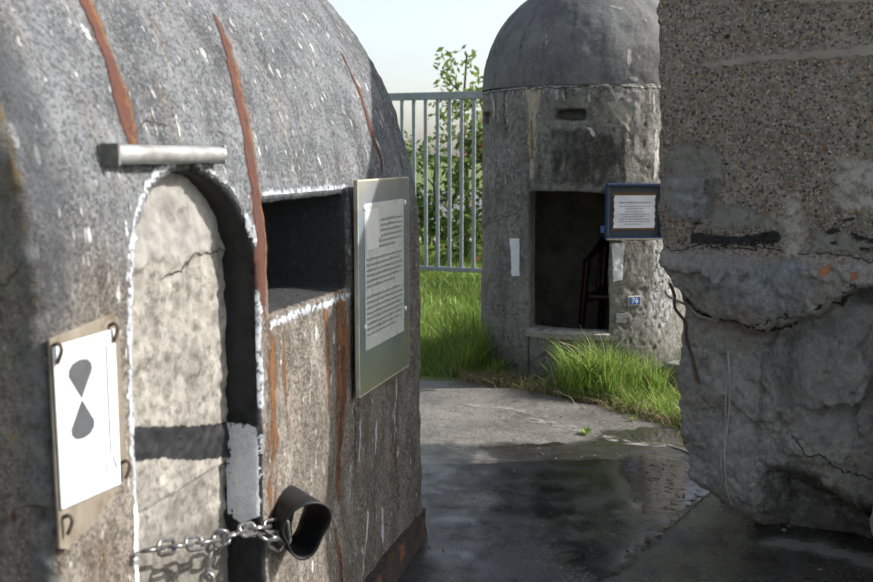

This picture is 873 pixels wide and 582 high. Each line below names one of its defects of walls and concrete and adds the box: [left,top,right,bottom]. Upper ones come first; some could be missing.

rust [80,0,137,145]
rust [213,14,267,317]
crack [790,434,873,482]